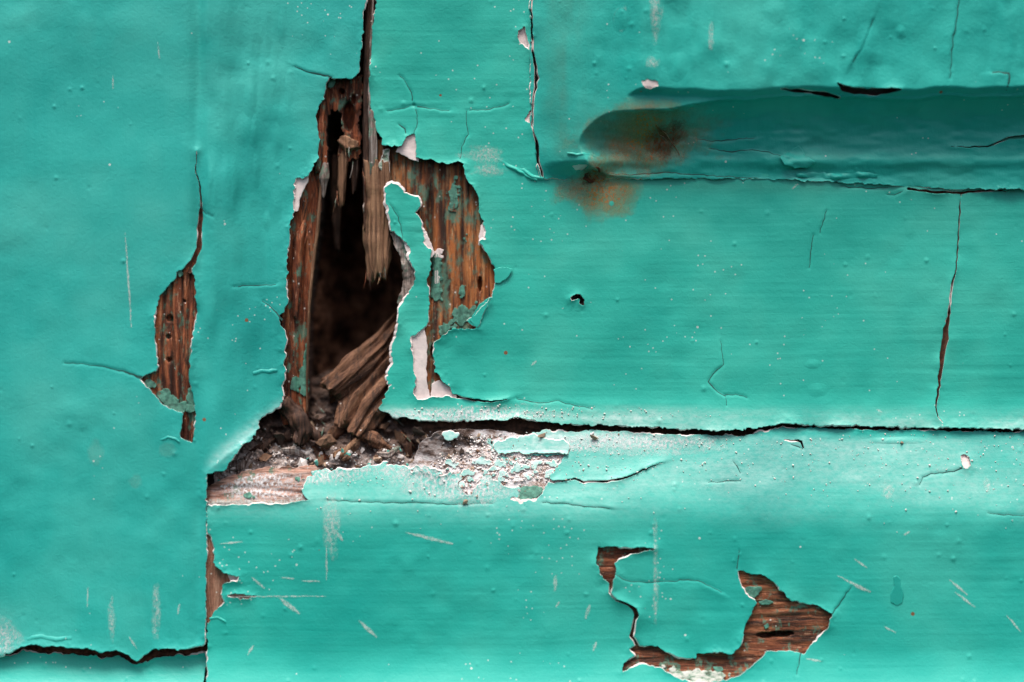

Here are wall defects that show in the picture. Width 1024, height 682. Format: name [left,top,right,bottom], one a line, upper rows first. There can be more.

crack [388,9,543,177]
peeling [379,149,390,171]
peeling [141,262,197,442]
peeling [466,297,492,327]
crack [846,186,1006,417]
peeling [408,429,570,503]
peeling [206,534,255,629]
peeling [596,546,654,589]
peeling [622,571,832,682]